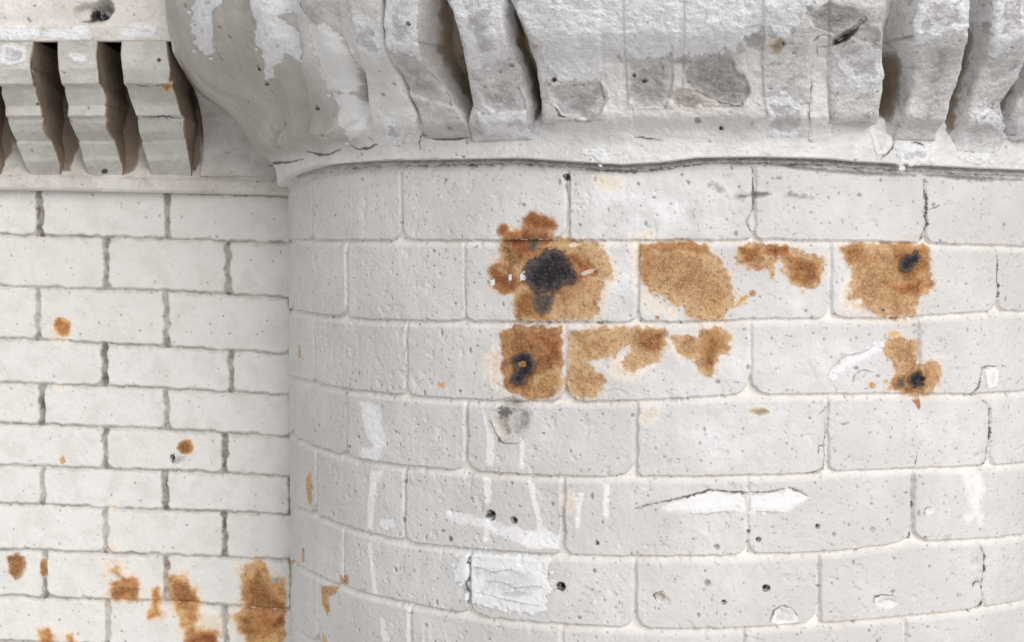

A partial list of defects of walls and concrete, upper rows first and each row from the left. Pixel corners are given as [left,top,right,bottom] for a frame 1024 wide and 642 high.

peeling [187,0,222,60]
peeling [249,0,422,145]
rust [53,317,71,338]
rust [488,212,826,401]
rust [840,241,943,409]
rust [174,439,194,465]
peeling [636,487,807,515]
rust [7,552,27,580]
rust [108,565,220,642]
rust [230,548,304,642]
peeling [452,547,556,615]